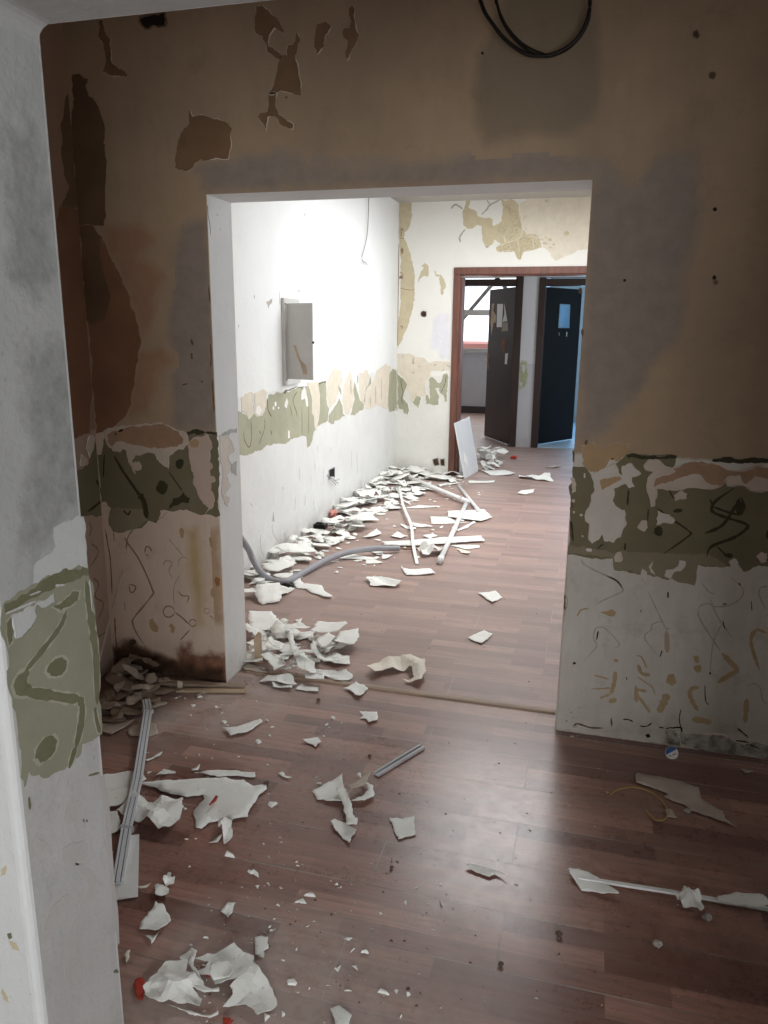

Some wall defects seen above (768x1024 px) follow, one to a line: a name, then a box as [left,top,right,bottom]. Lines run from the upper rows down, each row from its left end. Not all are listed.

peeling [98,19,128,77]
peeling [254,5,302,131]
peeling [314,5,359,61]
peeling [174,109,232,172]
flaking render [451,197,591,261]
peeling [397,202,446,373]
flaking render [570,440,629,516]
peeling [637,511,675,531]
peeling [641,561,686,582]
peeling [5,584,65,638]